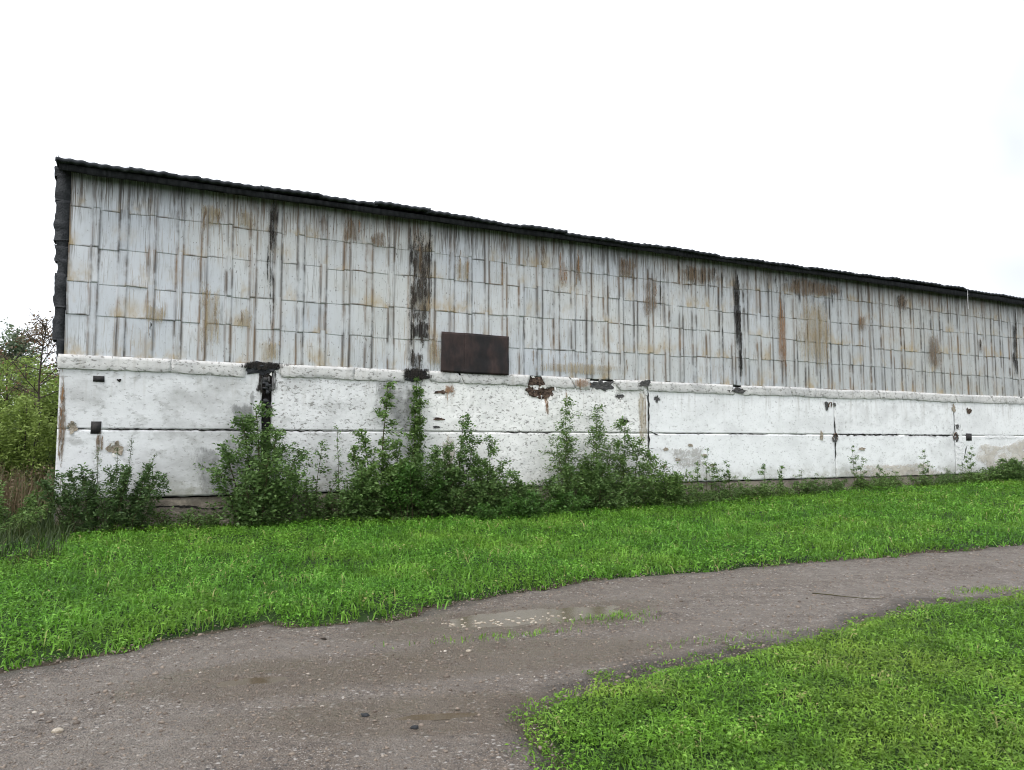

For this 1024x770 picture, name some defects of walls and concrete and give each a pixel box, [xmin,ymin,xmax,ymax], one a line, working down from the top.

water stain [267,212,279,326]
water stain [409,228,432,309]
water stain [673,263,742,364]
corrosion [778,279,833,367]
corrosion [58,369,66,484]
spalling [105,440,124,457]
spalling [590,379,624,399]